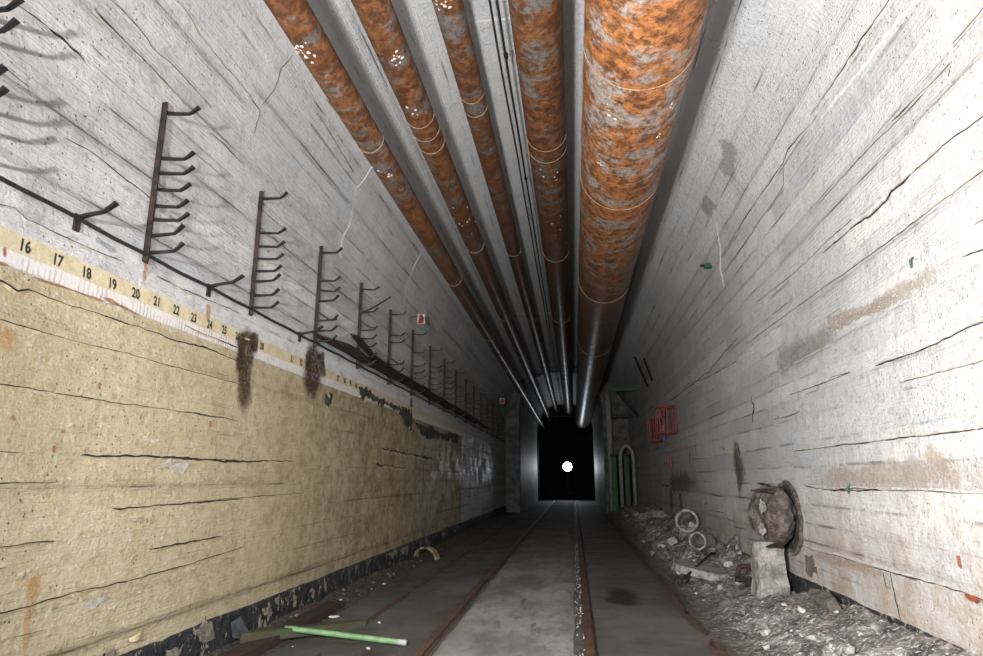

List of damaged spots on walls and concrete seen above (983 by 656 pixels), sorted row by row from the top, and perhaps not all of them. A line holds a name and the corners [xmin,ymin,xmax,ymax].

crack [818,5,983,204]
crack [757,114,983,302]
crack [670,168,983,401]
damp [237,331,258,412]
damp [304,347,325,396]
crack [772,369,851,419]
crack [80,454,293,465]
damp [734,443,743,490]
crack [793,422,983,451]
peeling [164,647,181,656]
peeling [196,616,215,645]
peeling [262,594,280,622]